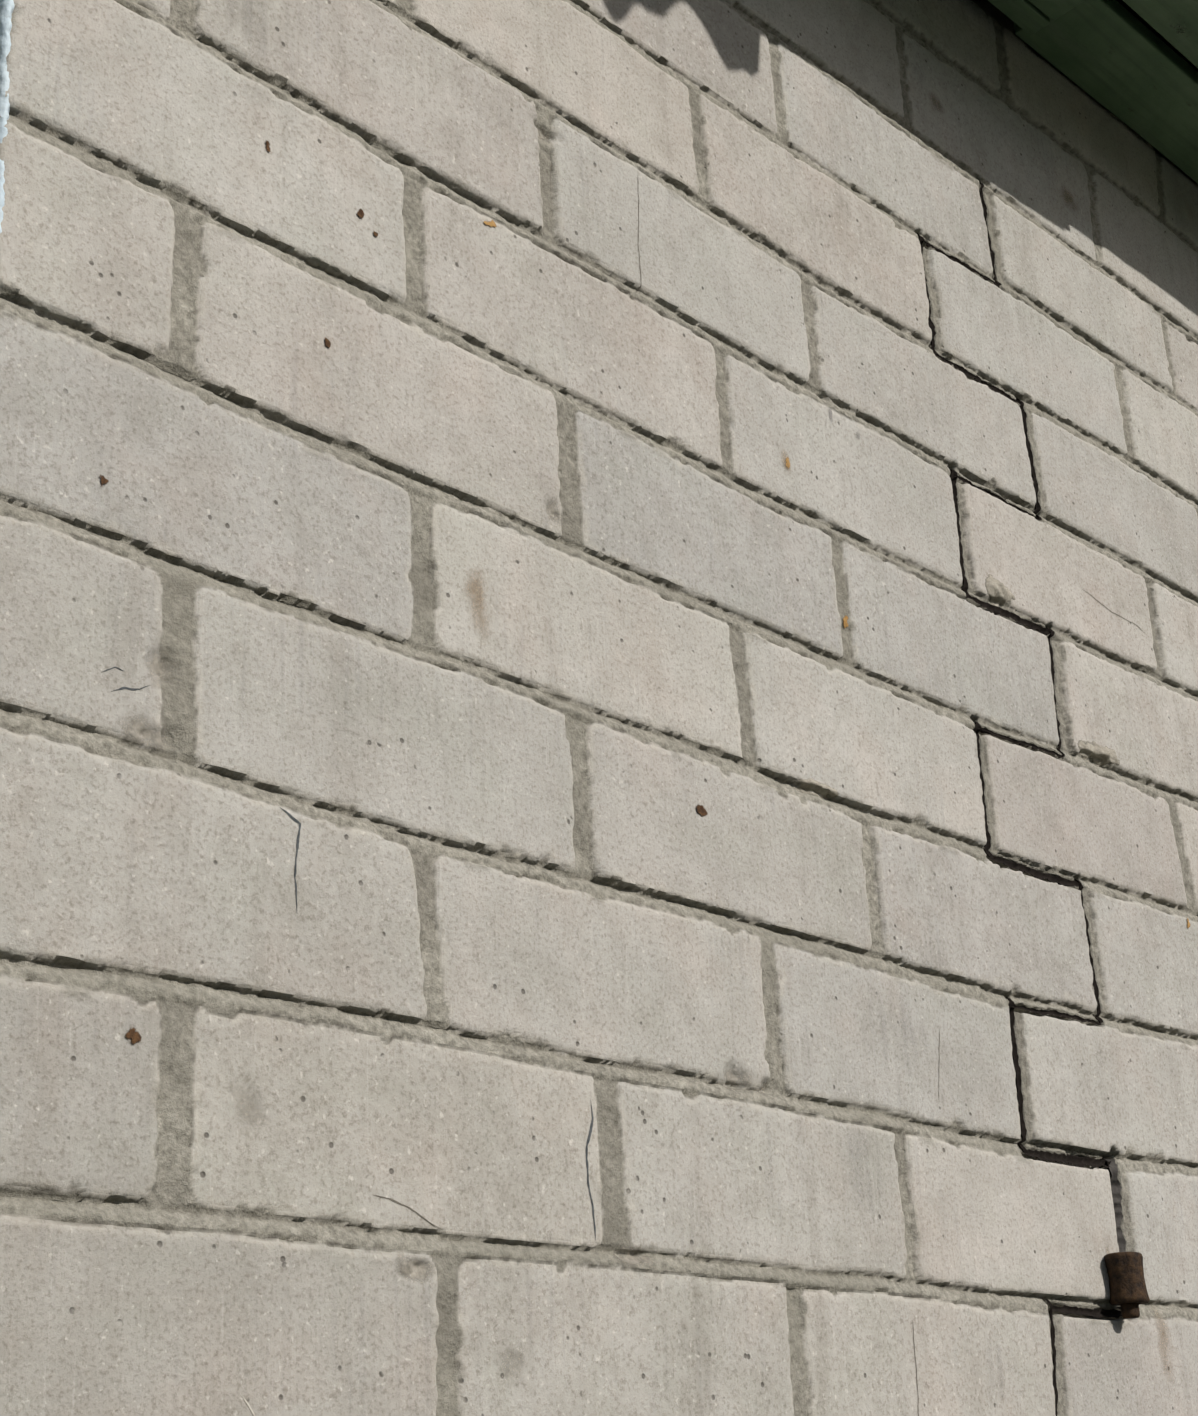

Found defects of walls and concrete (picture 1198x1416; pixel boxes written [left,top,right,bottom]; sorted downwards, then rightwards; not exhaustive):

crack [916,181,1126,1252]
crack [911,1320,919,1416]
crack [1046,1300,1122,1416]